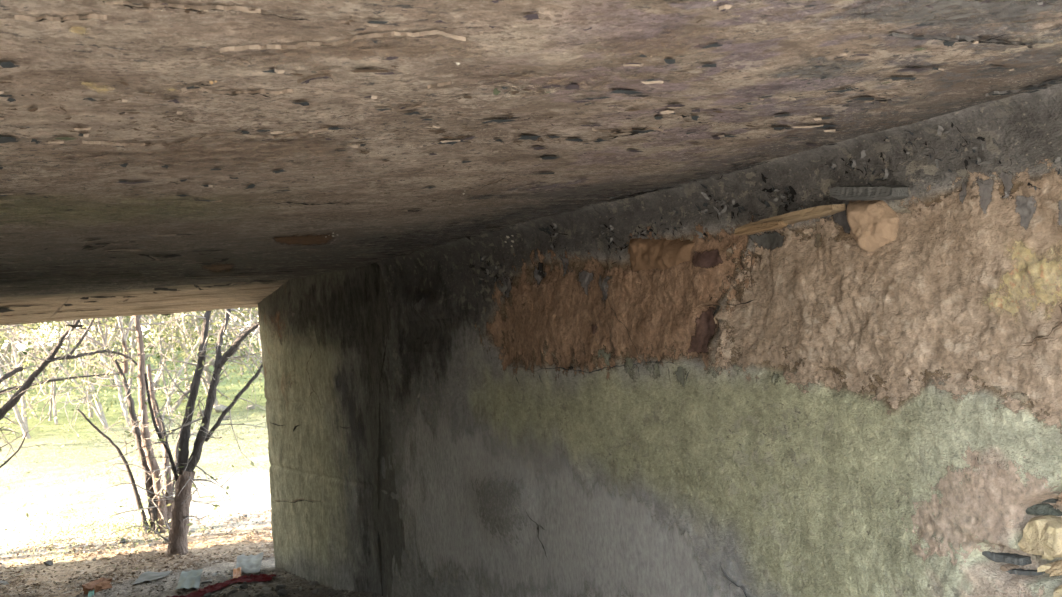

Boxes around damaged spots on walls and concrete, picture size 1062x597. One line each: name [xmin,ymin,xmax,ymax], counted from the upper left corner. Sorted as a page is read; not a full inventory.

crack [15,0,316,23]
spalling [213,19,496,76]
peeling [702,1,740,67]
peeling [774,54,955,104]
peeling [0,55,843,201]
spalling [469,121,1062,433]
water stain [333,368,375,592]